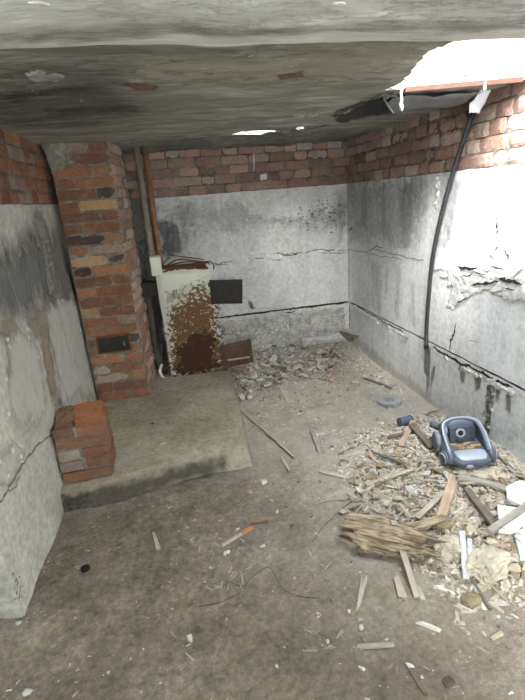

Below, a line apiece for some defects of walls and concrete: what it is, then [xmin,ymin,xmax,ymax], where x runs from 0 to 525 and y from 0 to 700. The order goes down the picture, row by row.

spalling [328,93,400,117]
water stain [0,212,75,403]
crack [217,246,525,391]
spalling [433,191,525,311]
crack [0,434,53,503]